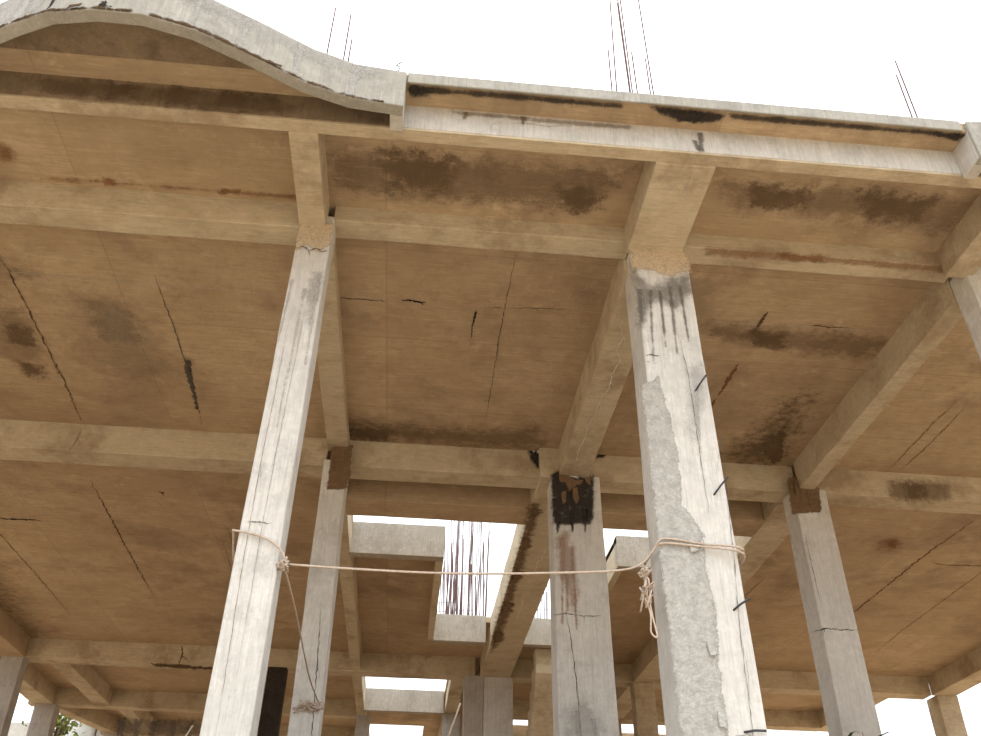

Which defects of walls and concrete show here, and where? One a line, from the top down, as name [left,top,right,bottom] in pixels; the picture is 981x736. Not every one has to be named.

crack [0,260,82,455]
crack [155,278,186,364]
crack [471,261,567,421]
leakage [630,247,691,341]
crack [90,481,152,593]
leakage [529,451,539,469]
leakage [491,471,594,649]
spalling [559,475,591,504]
spalling [641,376,729,736]
leakage [720,395,812,465]
crack [814,521,979,647]